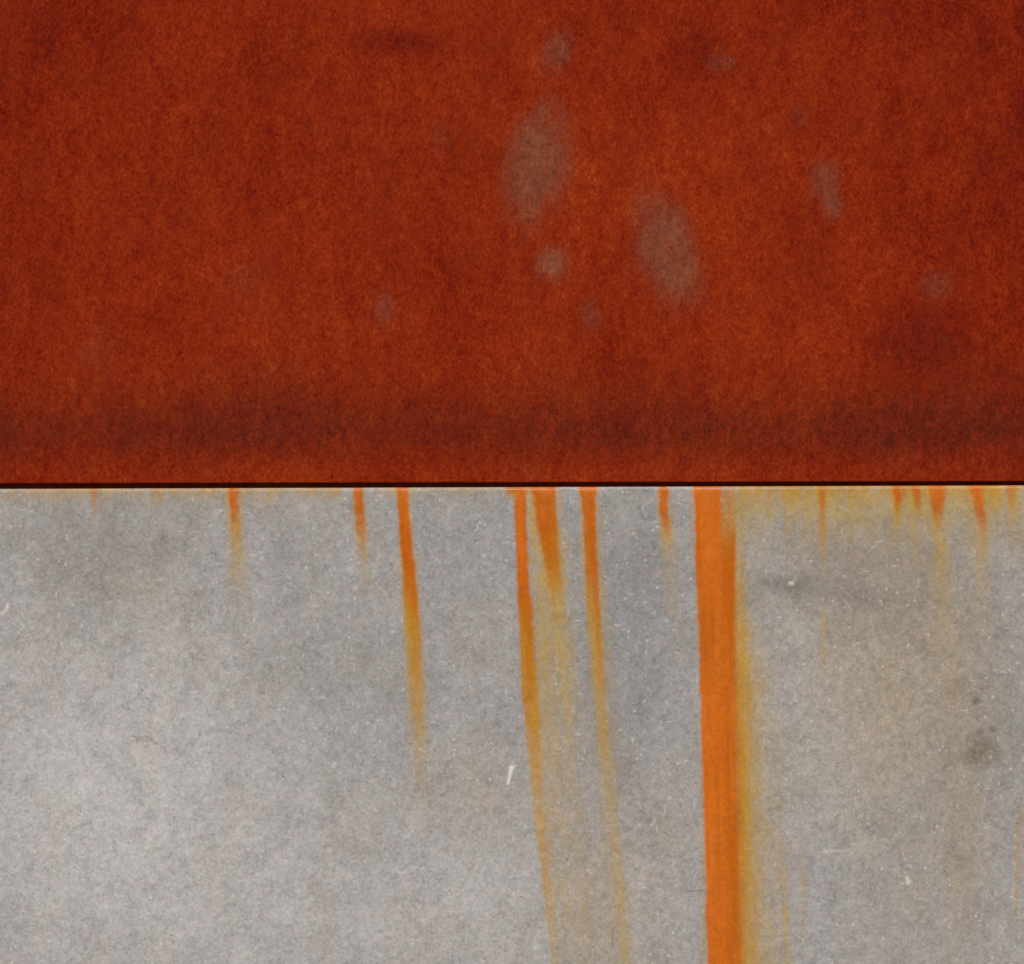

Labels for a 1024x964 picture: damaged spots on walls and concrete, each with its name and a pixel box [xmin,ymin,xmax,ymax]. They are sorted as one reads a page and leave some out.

corrosion [0,487,642,964]
corrosion [653,485,1024,964]